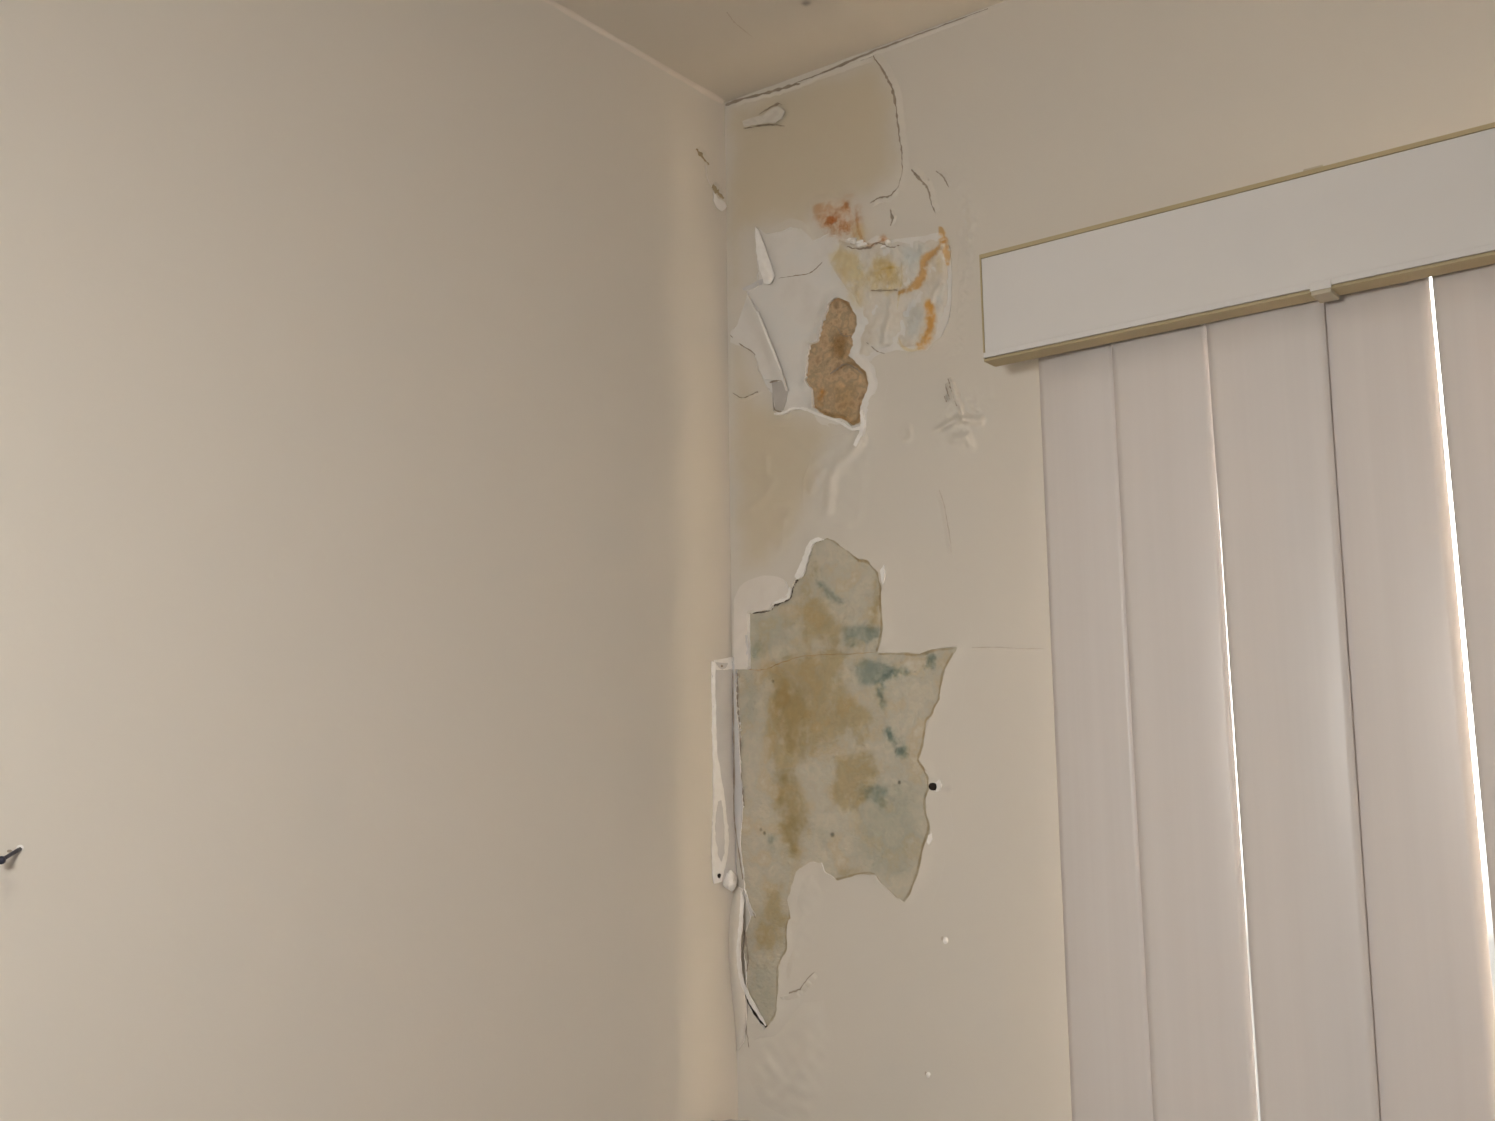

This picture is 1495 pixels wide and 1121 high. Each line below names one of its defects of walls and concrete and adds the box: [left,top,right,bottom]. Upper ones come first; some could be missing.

peeling [696,146,727,211]
crack [725,8,989,227]
peeling [729,210,967,447]
peeling [729,520,980,1052]